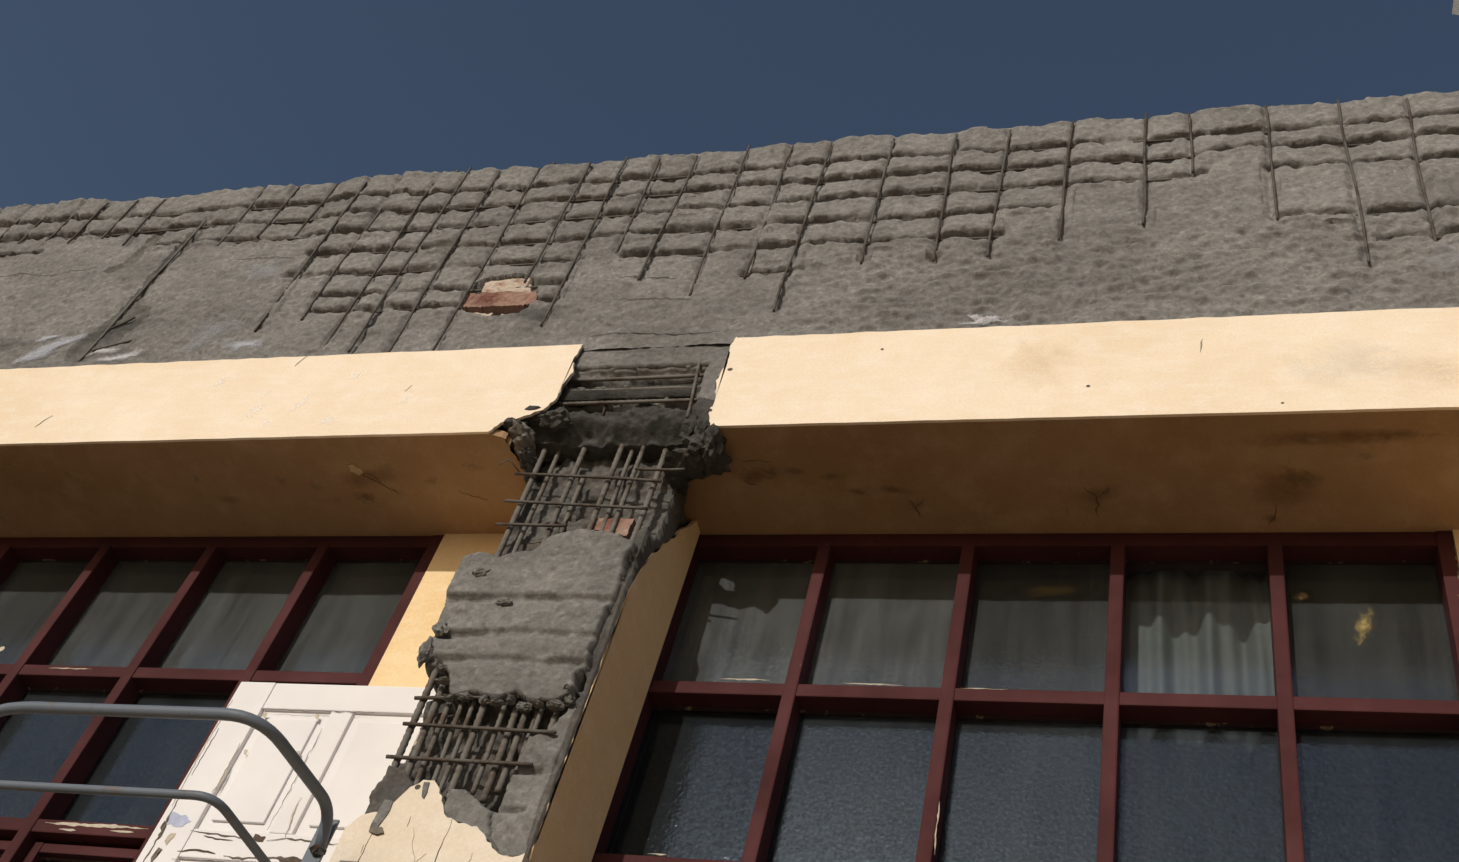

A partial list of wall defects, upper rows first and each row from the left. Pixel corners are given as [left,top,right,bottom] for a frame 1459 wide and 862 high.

spalling [0,91,1459,354]
spalling [365,343,733,861]
crack [407,804,472,862]